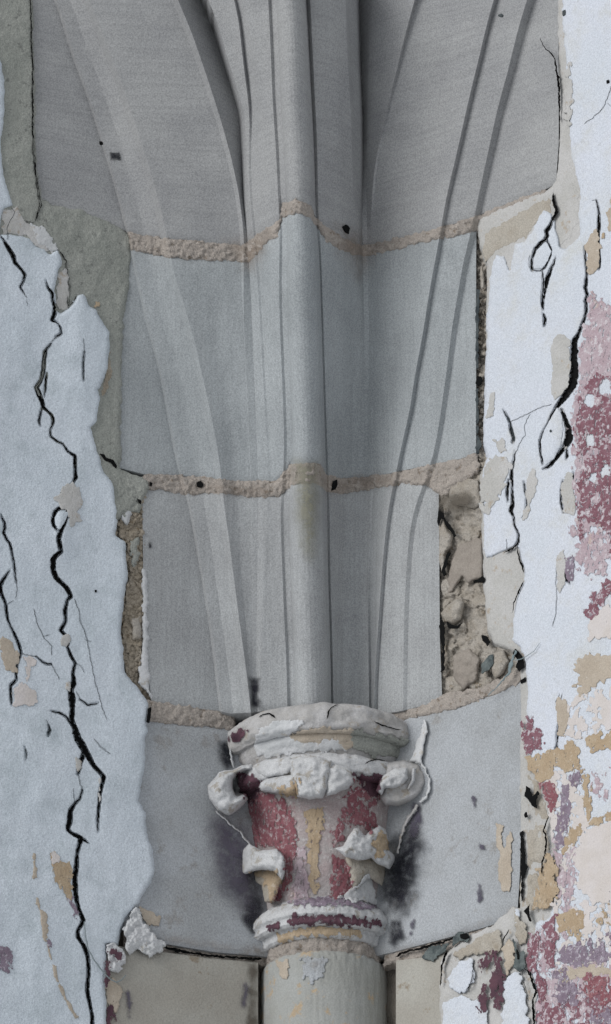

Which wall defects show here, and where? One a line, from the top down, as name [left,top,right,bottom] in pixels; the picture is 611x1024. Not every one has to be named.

peeling [1,206,58,253]
crack [0,0,85,482]
peeling [56,268,70,311]
spalling [439,176,580,702]
crack [503,193,601,610]
crack [0,508,110,1024]
spalling [119,500,153,699]
peeling [234,772,389,944]
peeling [228,720,409,759]
leakage [387,804,422,945]
peeling [439,291,611,1024]